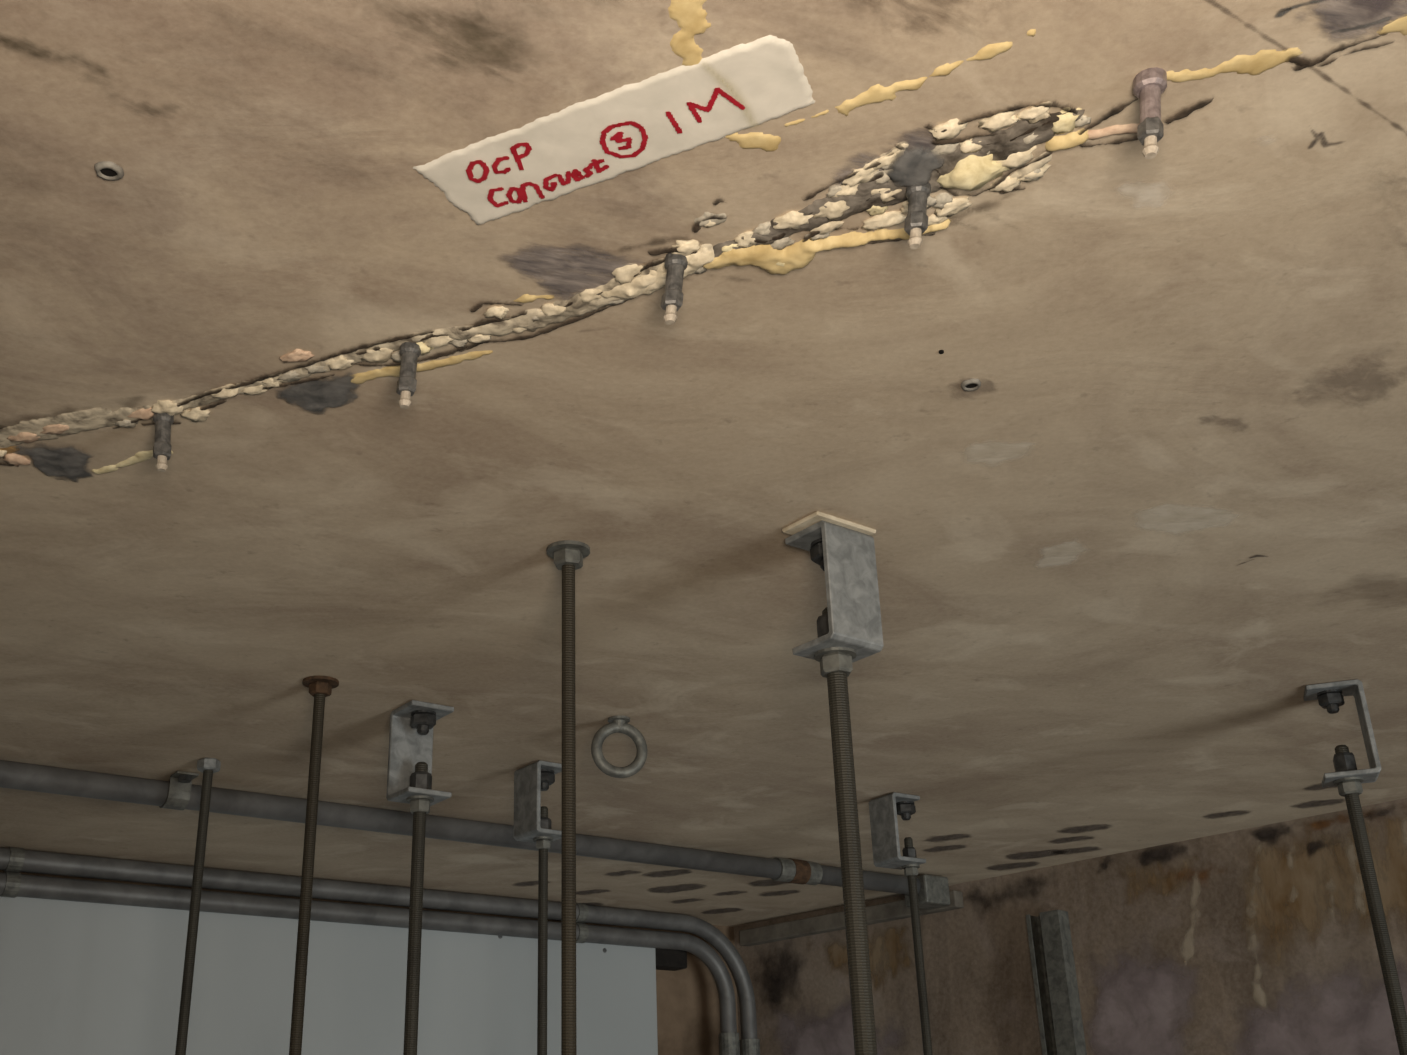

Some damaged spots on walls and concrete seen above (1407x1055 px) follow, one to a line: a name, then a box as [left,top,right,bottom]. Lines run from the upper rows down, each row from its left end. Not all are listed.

crack [1289,34,1391,71]
crack [1309,132,1338,148]
crack [0,99,1213,474]
damp [1140,844,1185,866]
damp [1255,826,1289,850]
damp [1182,879,1199,960]